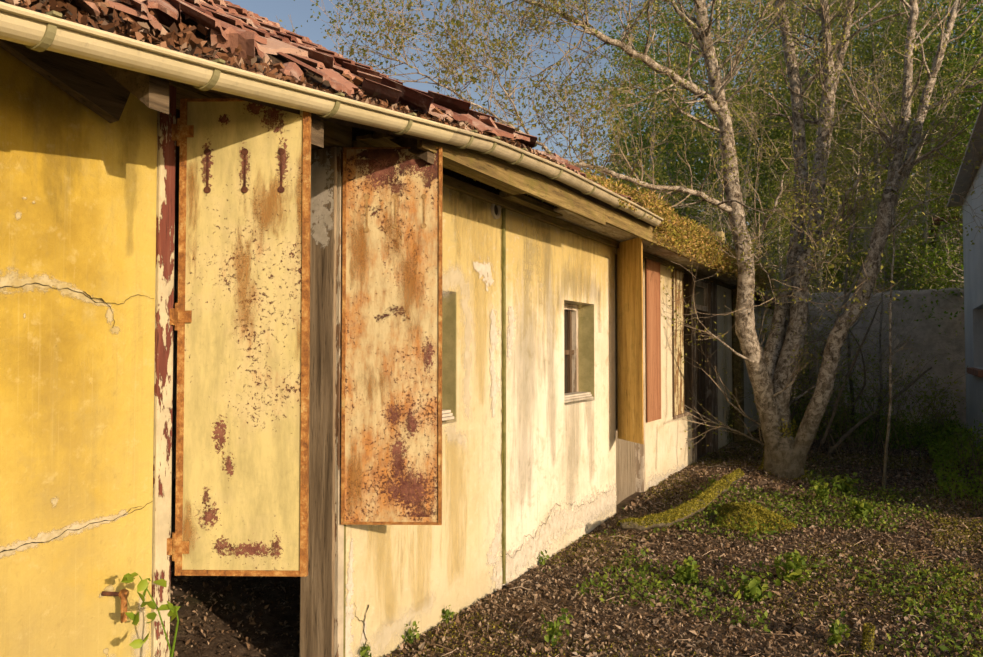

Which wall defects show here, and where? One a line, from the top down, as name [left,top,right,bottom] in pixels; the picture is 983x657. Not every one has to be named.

corrosion [189,138,215,215]
corrosion [237,103,302,232]
corrosion [351,159,437,197]
crack [0,268,154,334]
corrosion [238,245,250,321]
corrosion [349,228,367,279]
peeling [473,256,494,292]
corrosion [420,334,436,376]
corrosion [210,415,236,481]
corrosion [368,378,437,517]
crack [0,502,151,558]
corrosion [183,483,284,564]